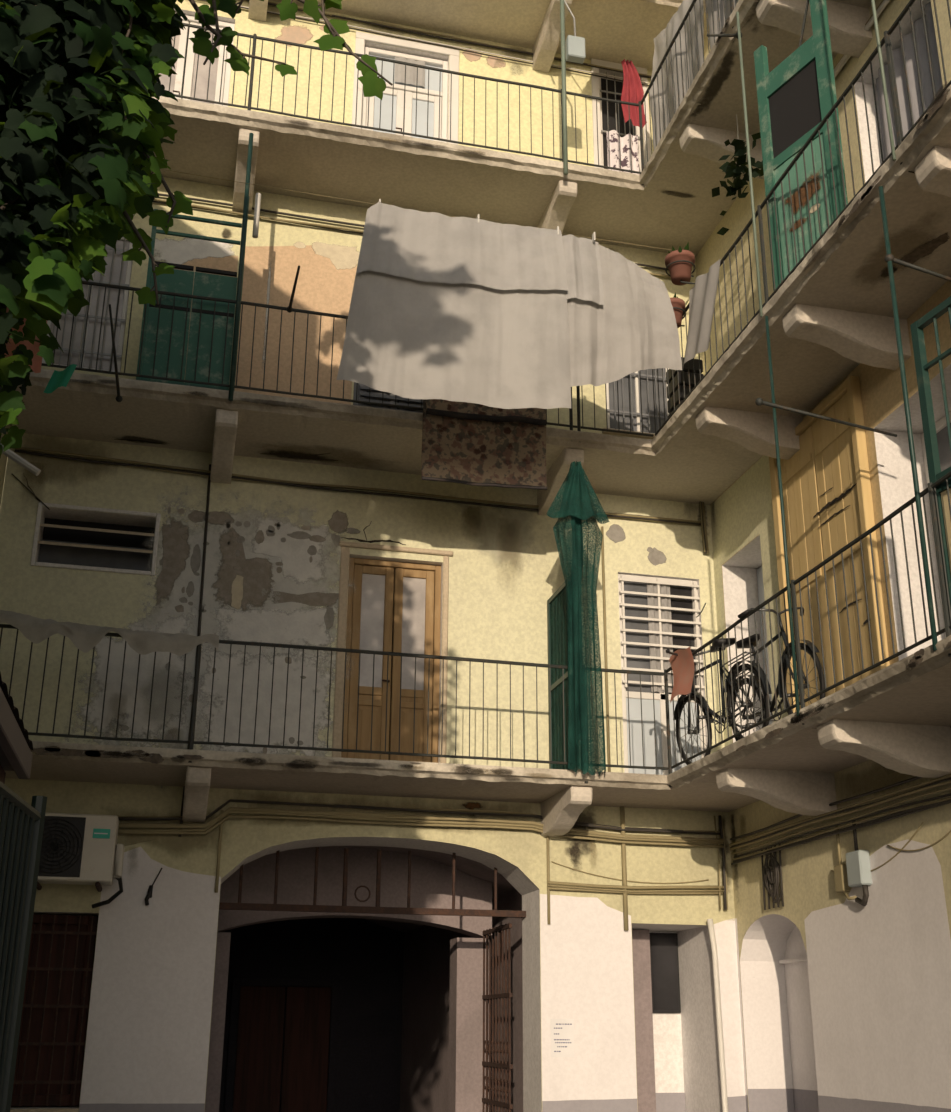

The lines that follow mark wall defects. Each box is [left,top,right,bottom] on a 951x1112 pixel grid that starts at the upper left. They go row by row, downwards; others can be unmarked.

water stain [690,41,734,116]
peeling [154,229,234,275]
peeling [294,242,360,270]
water stain [881,232,950,277]
crack [341,521,406,545]
peeling [30,502,380,769]
water stain [568,813,596,864]